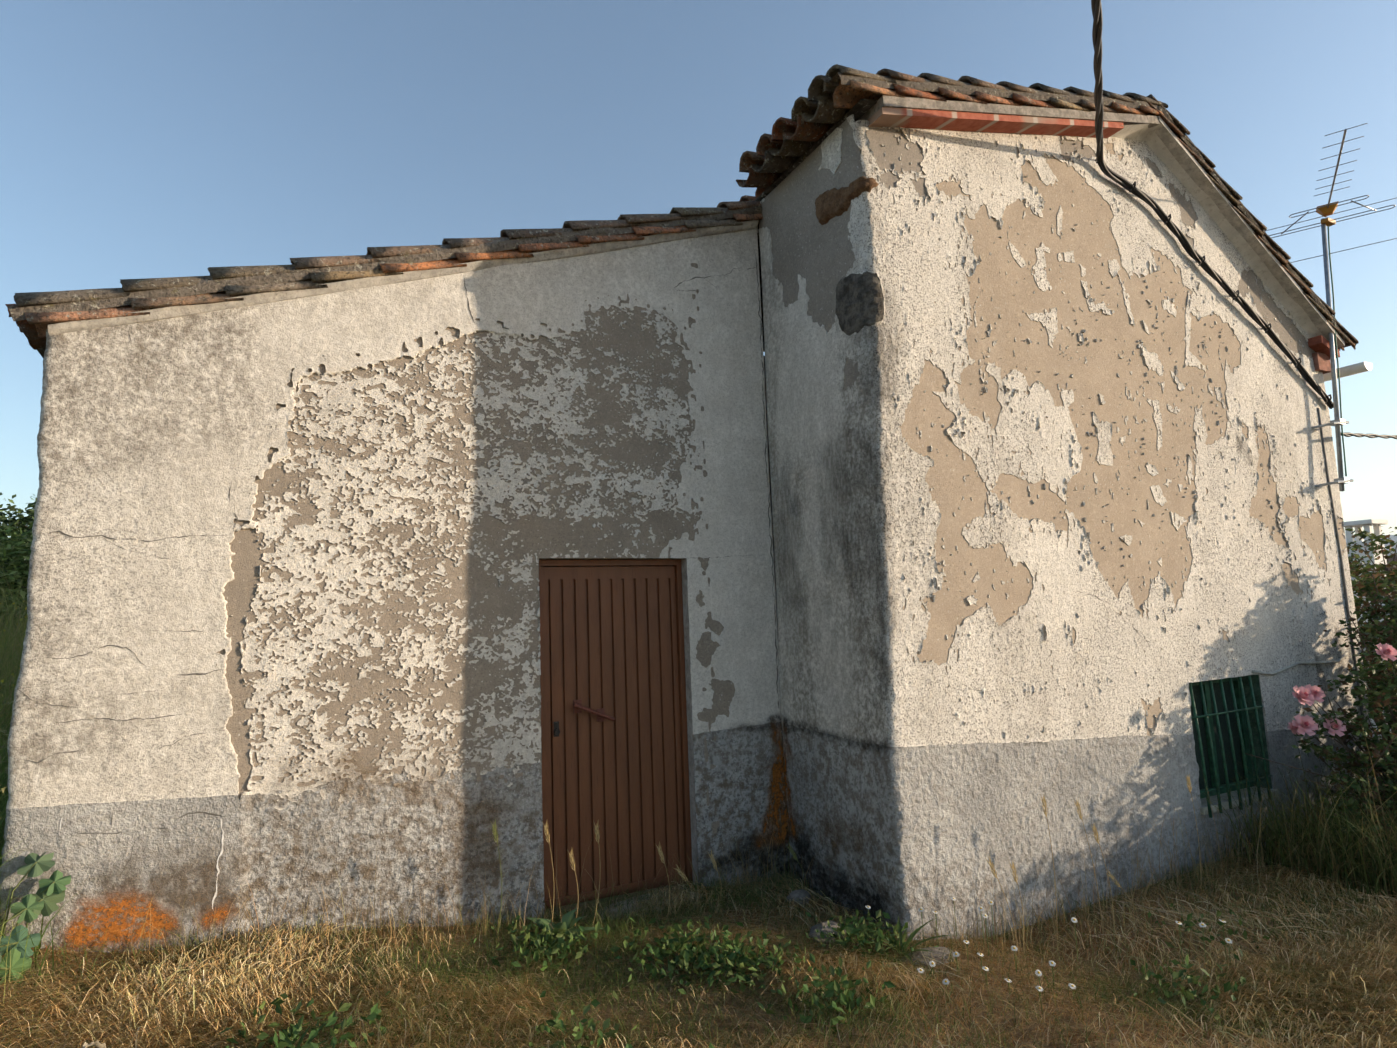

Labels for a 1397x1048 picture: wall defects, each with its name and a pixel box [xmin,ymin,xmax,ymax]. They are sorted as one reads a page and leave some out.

peeling [759,119,1346,688]
peeling [216,289,708,799]
crack [17,630,224,763]
peeling [696,557,735,769]
rust [757,725,797,848]